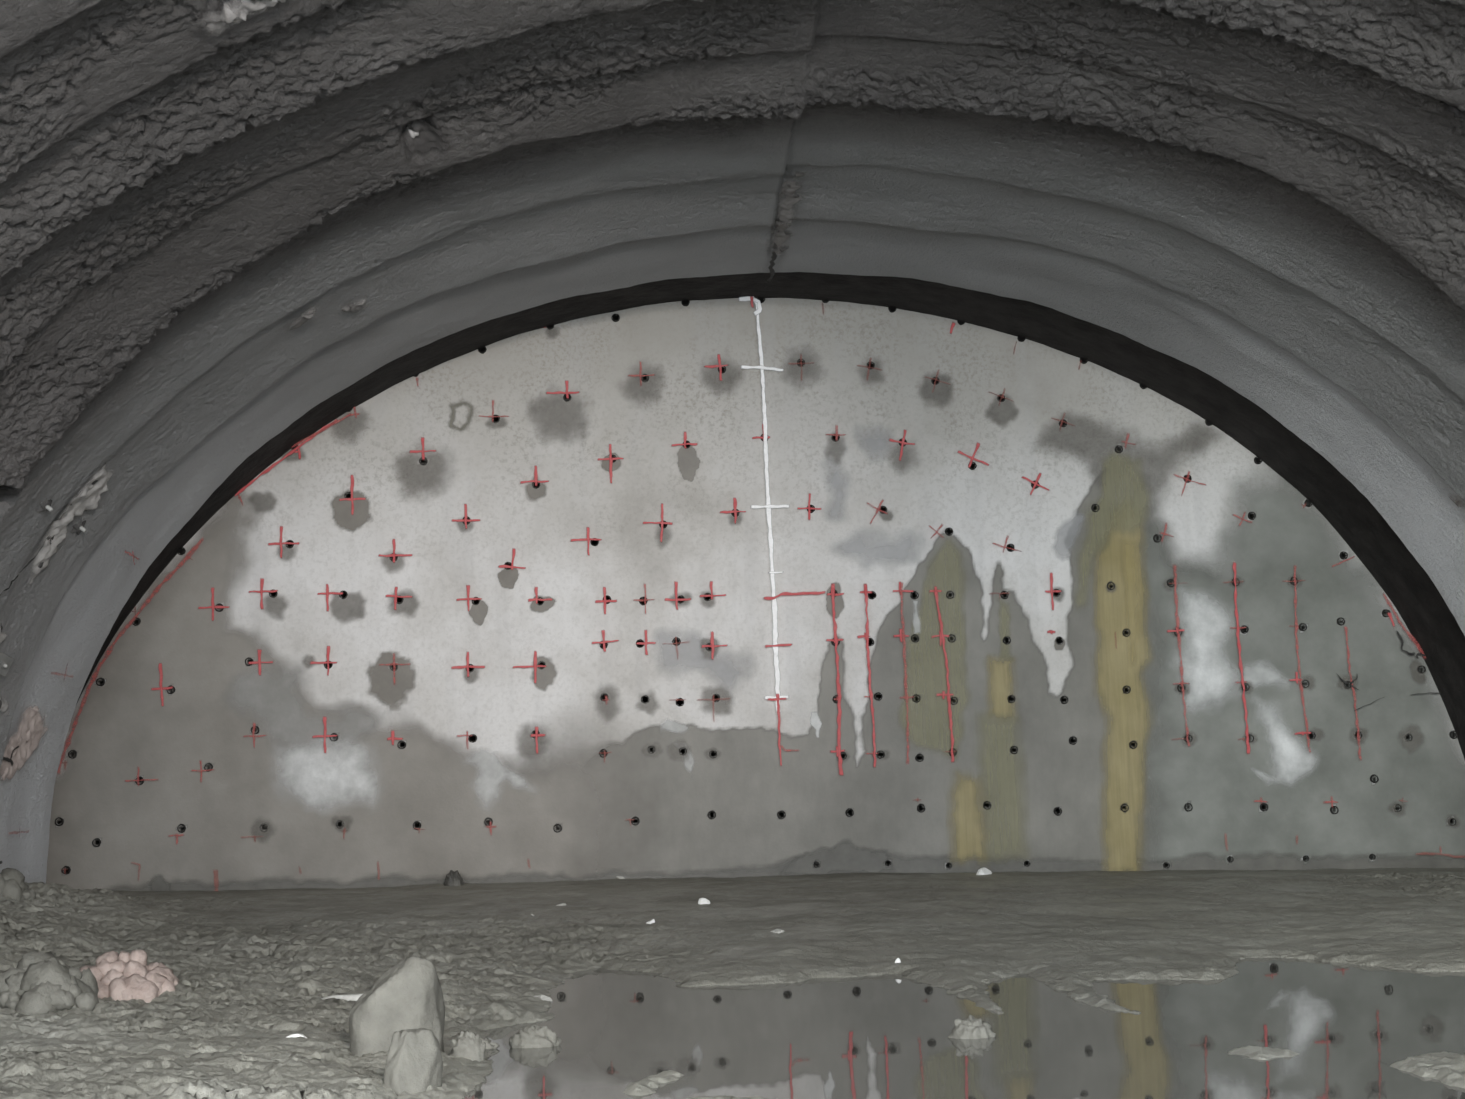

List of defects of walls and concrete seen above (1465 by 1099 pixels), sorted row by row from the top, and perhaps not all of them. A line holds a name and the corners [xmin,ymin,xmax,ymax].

spalling [203,0,286,32]
crack [766,221,789,281]
spalling [30,466,112,584]
damp [46,415,1465,891]
spalling [0,697,48,780]